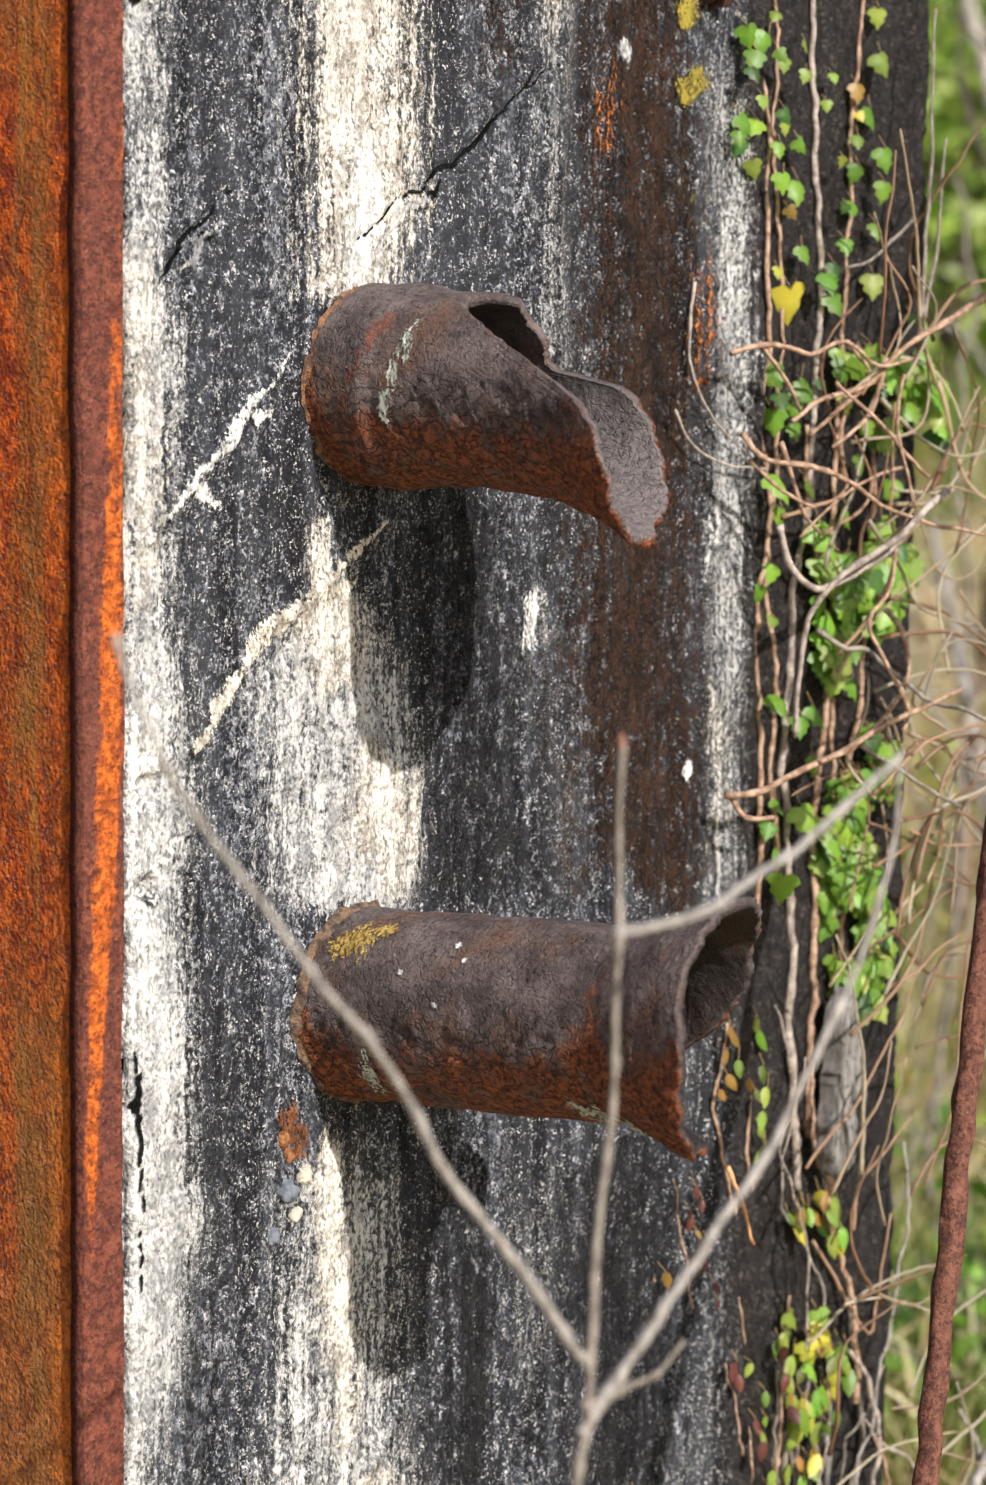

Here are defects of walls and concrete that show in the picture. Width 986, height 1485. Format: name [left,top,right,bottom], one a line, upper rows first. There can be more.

crack [158,189,233,285]
crack [357,63,560,253]
corrosion [539,0,731,917]
corrosion [276,1103,310,1159]